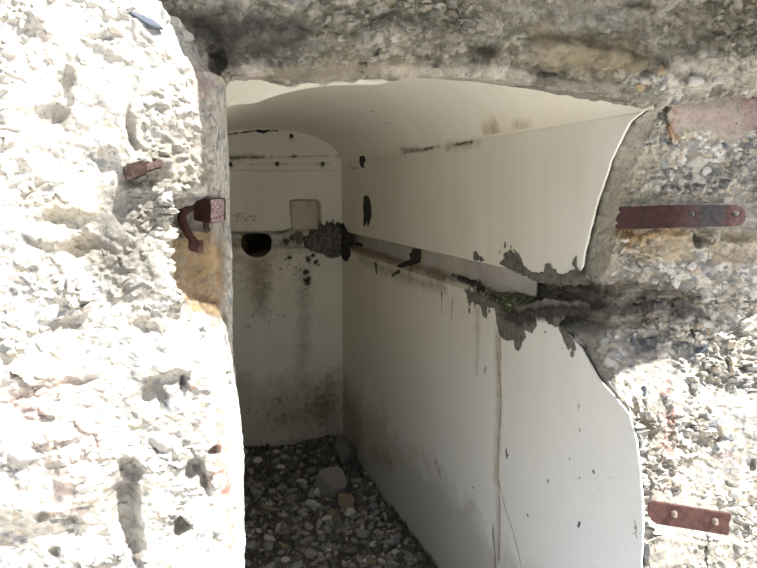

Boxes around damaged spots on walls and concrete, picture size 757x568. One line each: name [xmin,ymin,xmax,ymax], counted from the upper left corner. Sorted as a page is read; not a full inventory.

damp [231,229,303,246]
peeling [319,219,363,262]
rust [171,233,225,317]
damp [303,253,320,285]
peeling [499,242,590,287]
spalling [468,291,590,357]